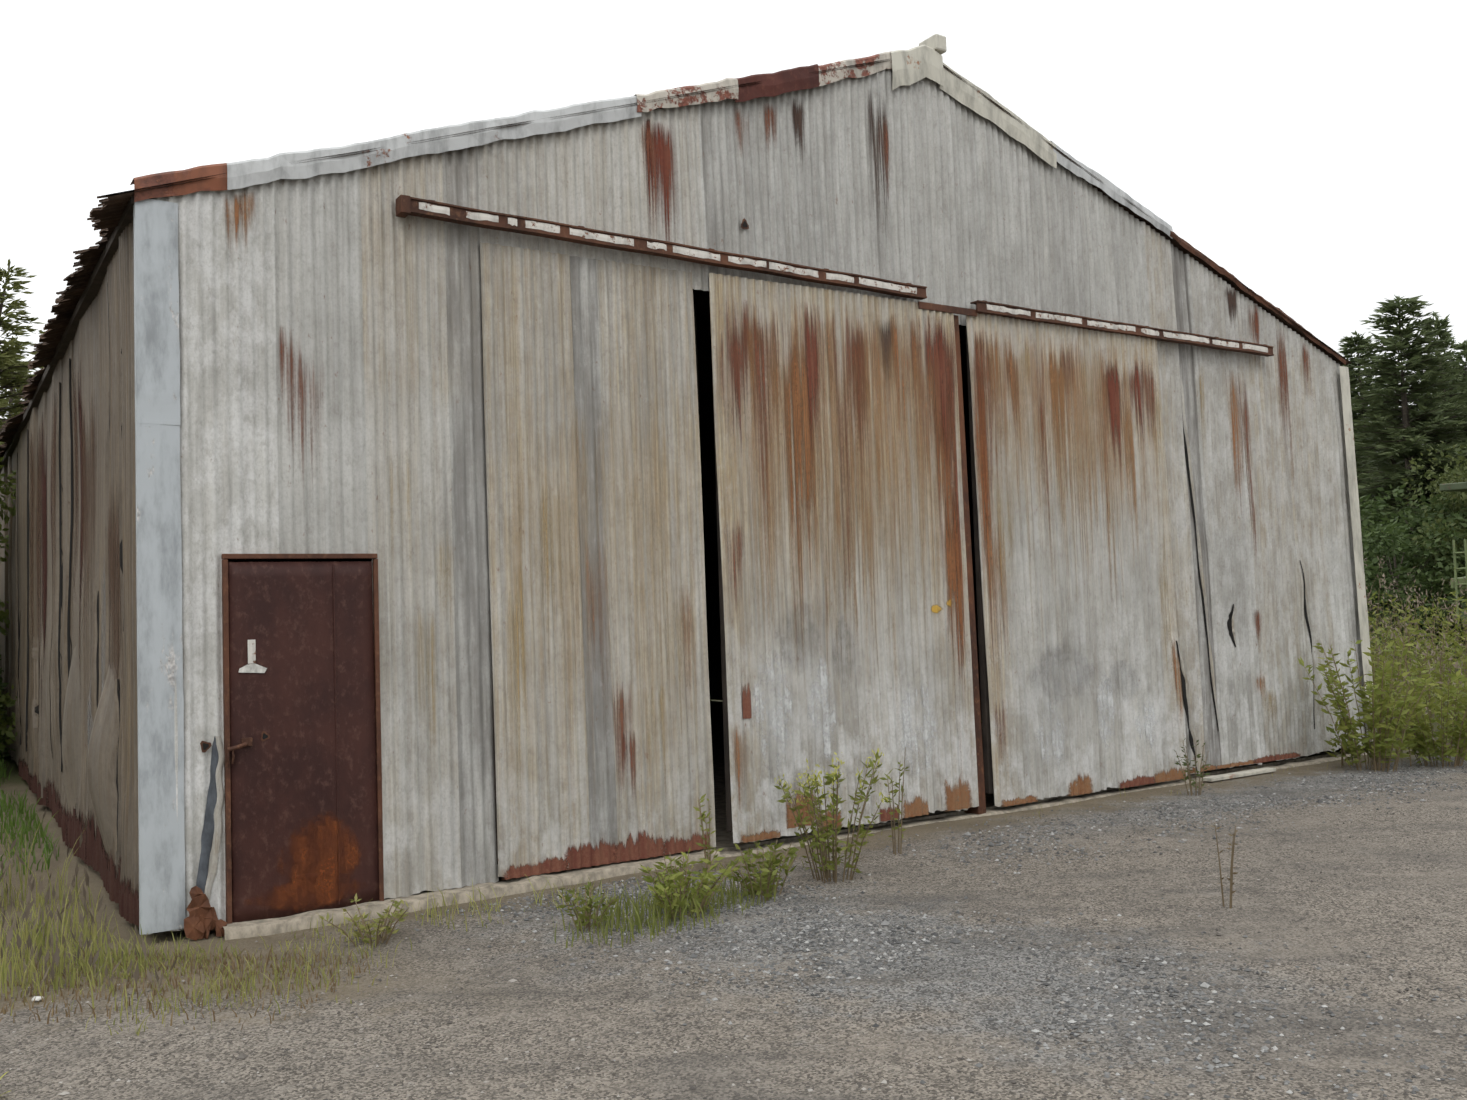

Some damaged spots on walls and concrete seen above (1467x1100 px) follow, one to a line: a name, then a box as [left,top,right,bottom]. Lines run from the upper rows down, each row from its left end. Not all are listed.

rust [642,120,674,242]
rust [280,332,314,458]
rust [721,308,965,672]
rust [974,339,1160,646]
rust [1230,376,1256,535]
rust [268,816,359,909]
rust [503,830,709,880]
rust [735,664,792,796]
rust [741,789,842,843]
rust [880,775,971,821]
rust [1068,775,1092,796]
rust [1119,752,1301,788]